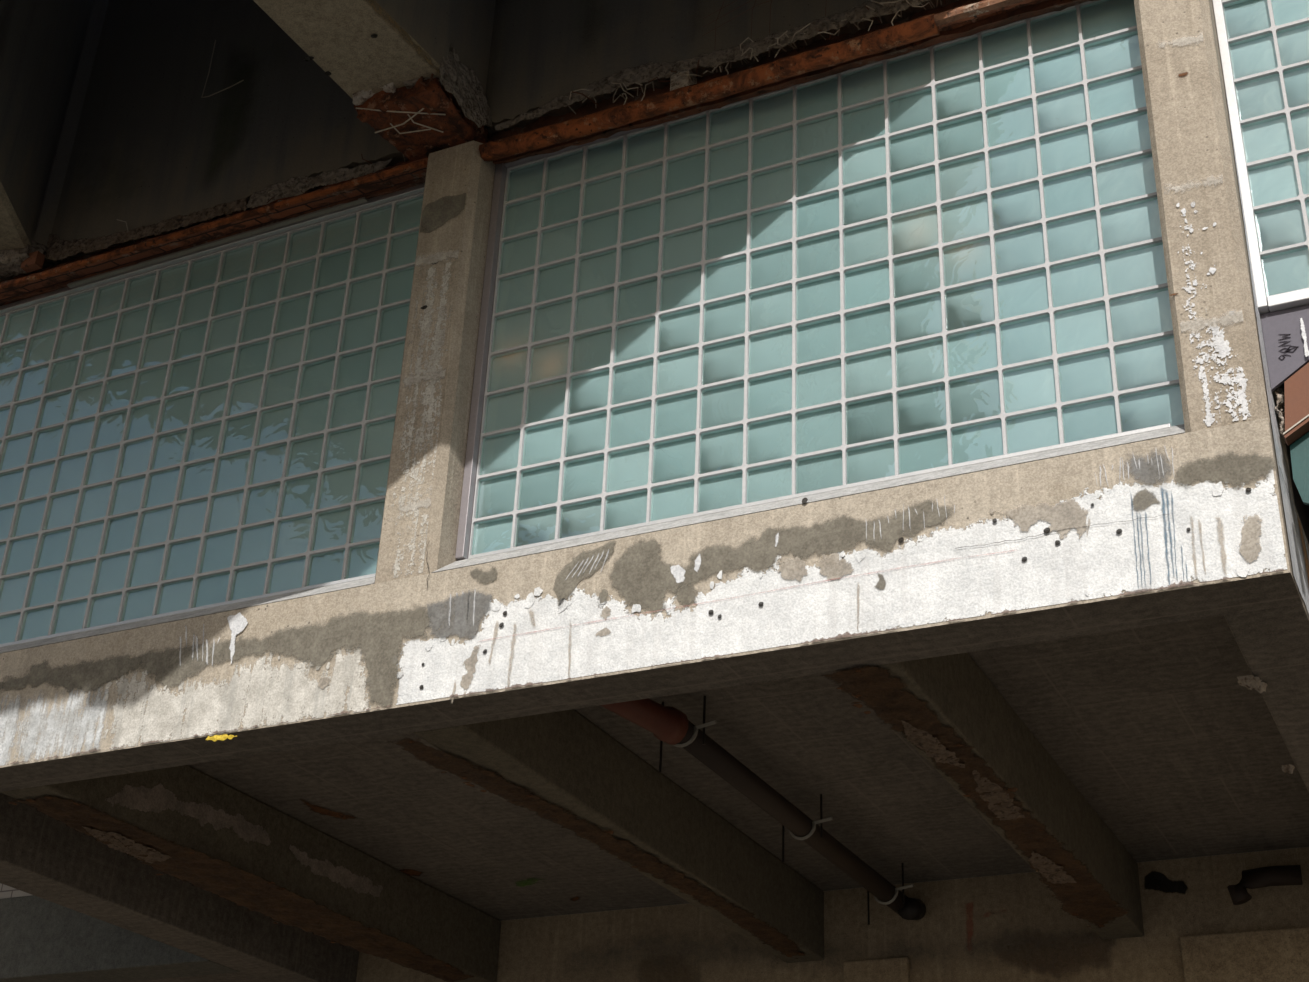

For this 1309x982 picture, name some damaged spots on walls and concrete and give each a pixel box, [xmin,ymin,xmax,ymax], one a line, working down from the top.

spalling [352,0,929,161]
peeling [7,95,1309,765]
leakage [0,567,497,766]
peeling [105,783,271,846]
peeling [287,844,383,897]